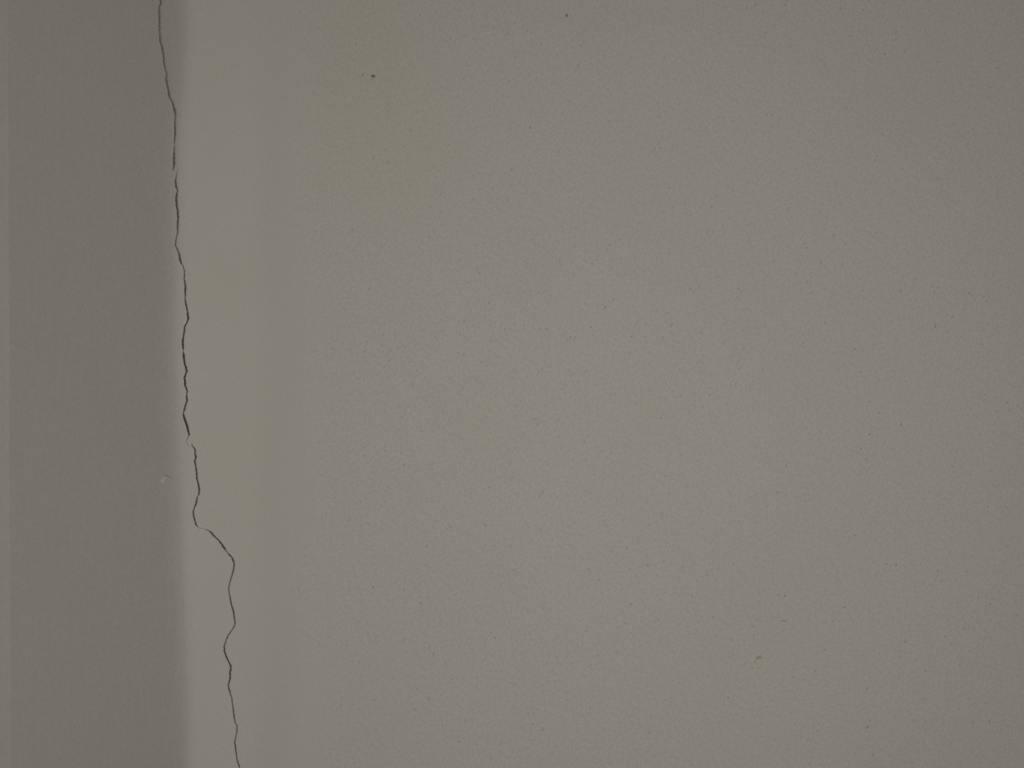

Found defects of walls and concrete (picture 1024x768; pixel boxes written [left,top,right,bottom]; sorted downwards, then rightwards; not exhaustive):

crack [157,0,242,768]